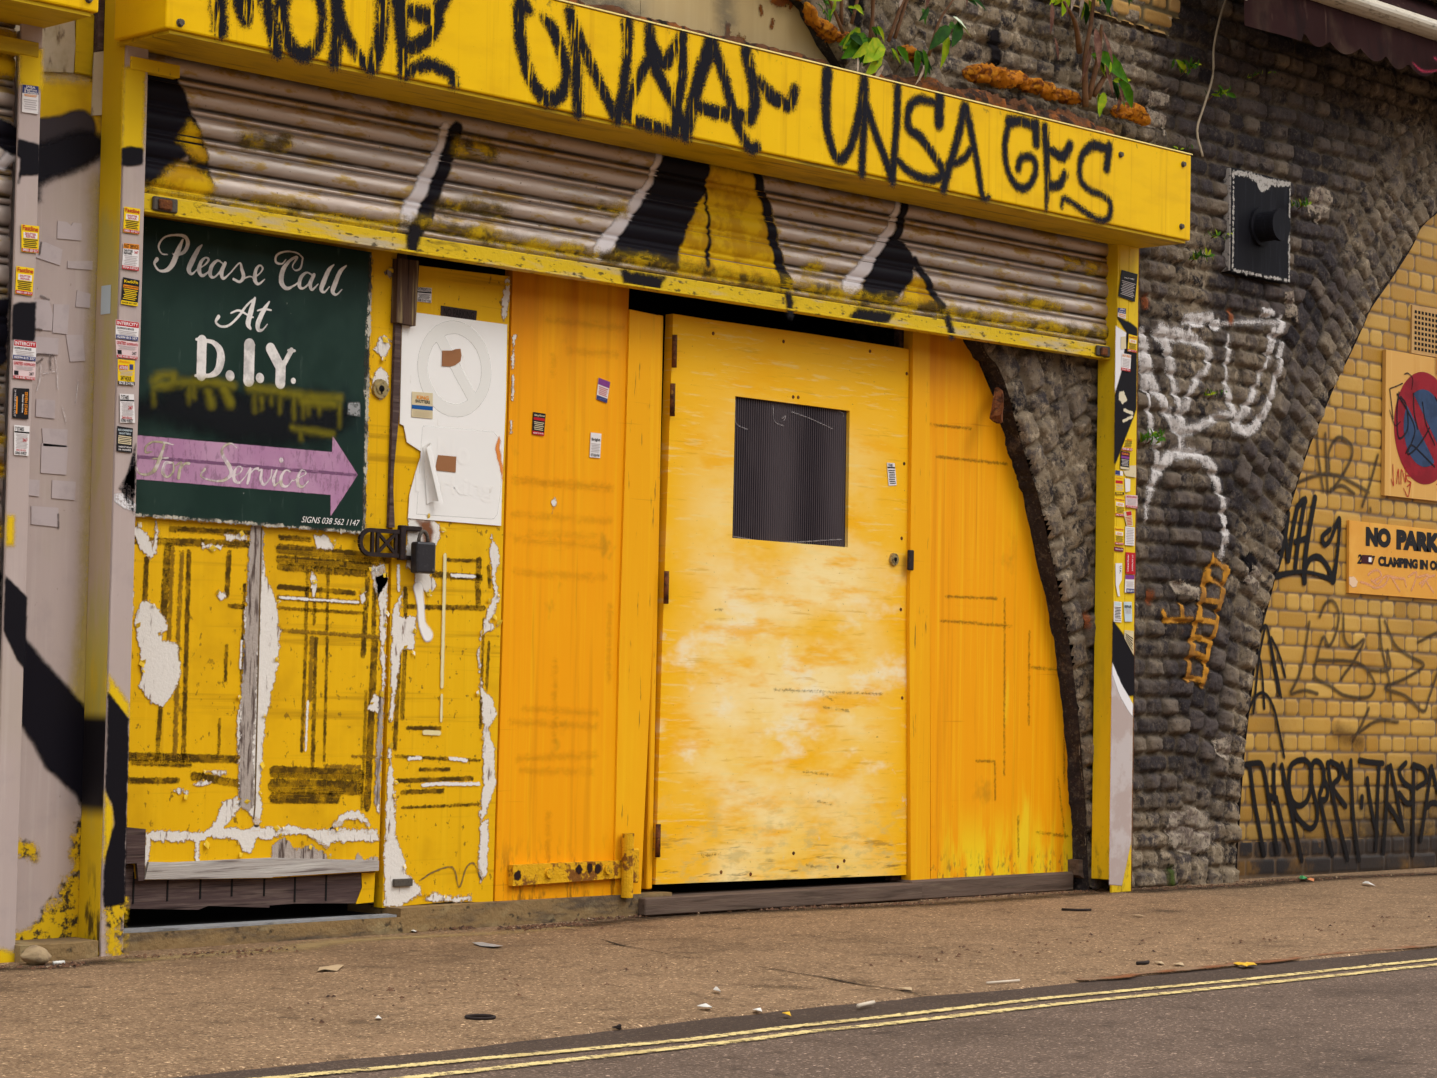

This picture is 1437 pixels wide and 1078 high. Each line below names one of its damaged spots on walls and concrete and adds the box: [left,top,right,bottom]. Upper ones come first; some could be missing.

peeling [135,520,160,560]
peeling [132,582,182,707]
peeling [145,513,503,907]
crack [759,966,917,994]